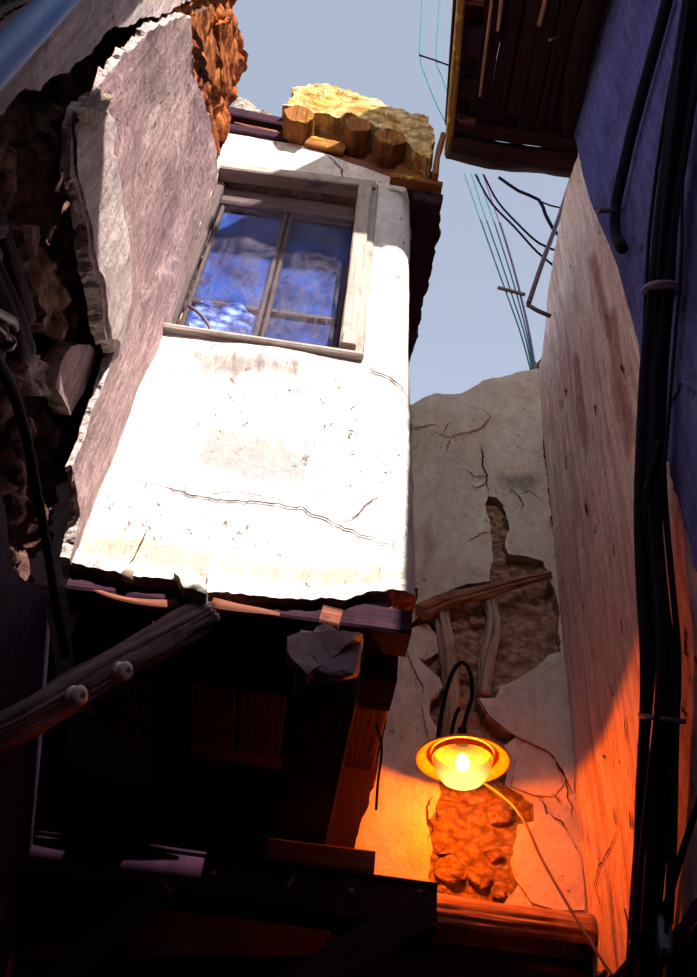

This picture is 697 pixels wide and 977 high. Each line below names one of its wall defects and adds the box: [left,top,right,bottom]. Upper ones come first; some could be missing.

crack [0,0,28,21]
flaking render [0,0,248,583]
damp [204,354,295,371]
crack [129,479,399,548]
crack [367,365,556,556]
flaking render [60,505,586,912]